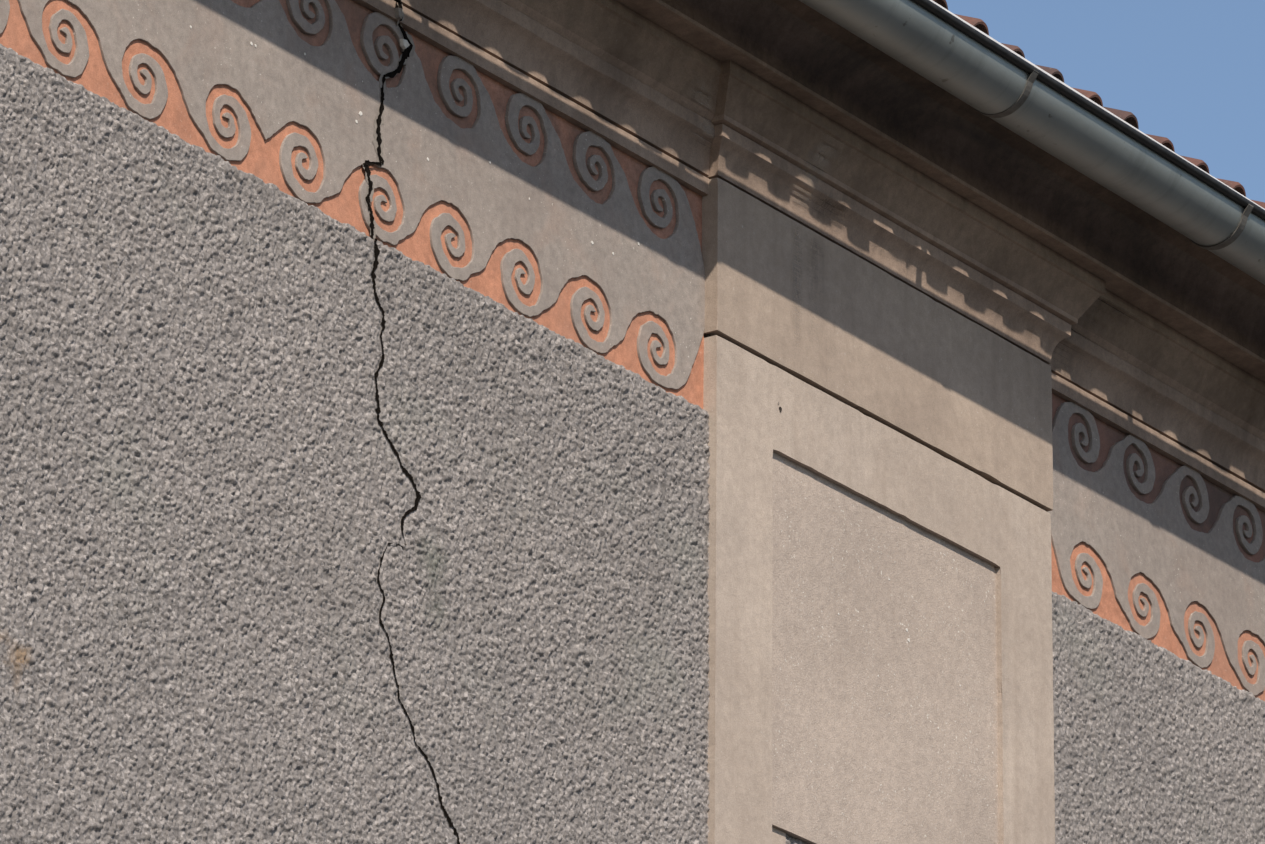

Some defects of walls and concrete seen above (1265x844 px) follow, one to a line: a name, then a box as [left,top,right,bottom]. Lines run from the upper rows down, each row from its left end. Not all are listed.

crack [363,0,466,844]